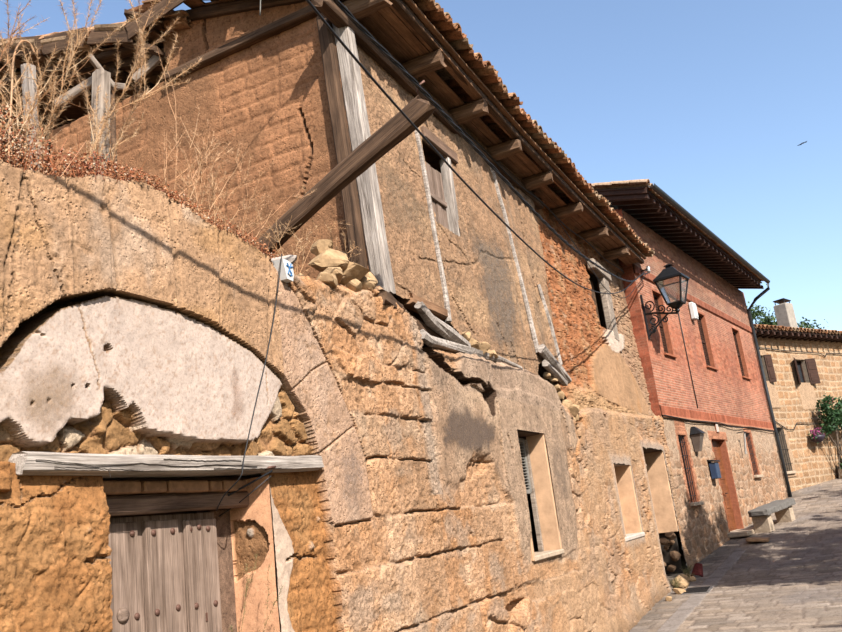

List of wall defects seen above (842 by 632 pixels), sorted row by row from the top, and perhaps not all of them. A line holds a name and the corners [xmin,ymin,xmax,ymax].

crack [0,176,316,444]
crack [419,224,548,335]
peeling [533,192,656,416]
spalling [0,384,321,462]
crack [421,346,497,416]